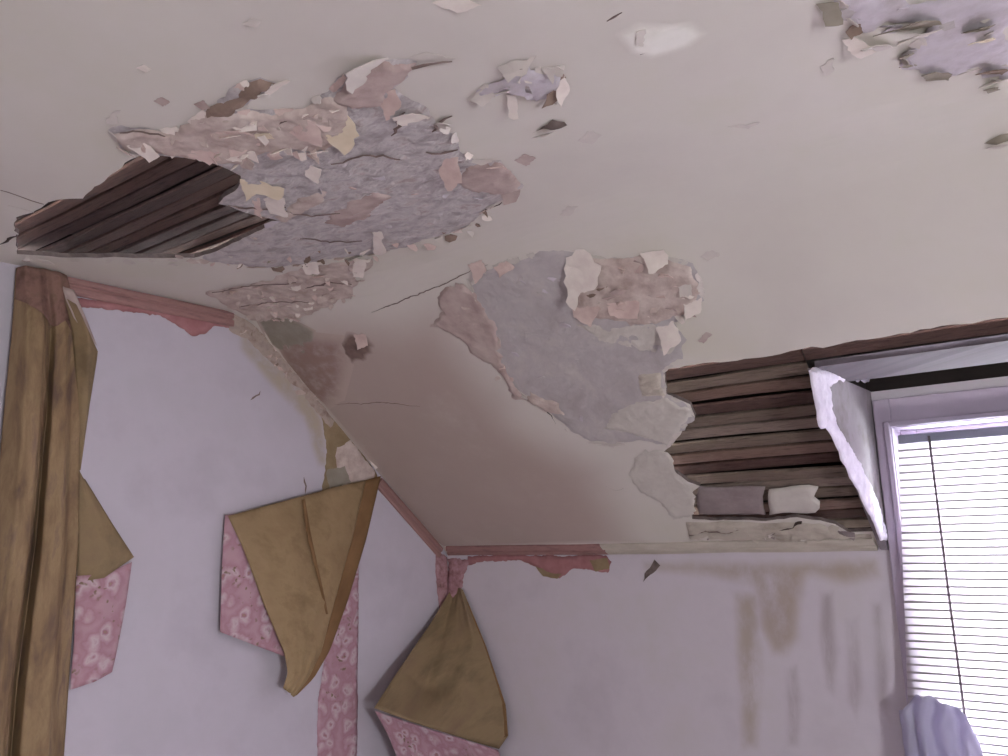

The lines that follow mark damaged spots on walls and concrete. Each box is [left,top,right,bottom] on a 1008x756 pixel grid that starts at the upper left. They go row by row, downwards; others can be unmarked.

peeling [466,56,570,120]
peeling [816,0,1008,94]
flaking render [1,52,536,336]
crack [371,265,486,313]
peeling [342,332,375,364]
flaking render [430,249,1008,545]
leakage [640,552,888,754]